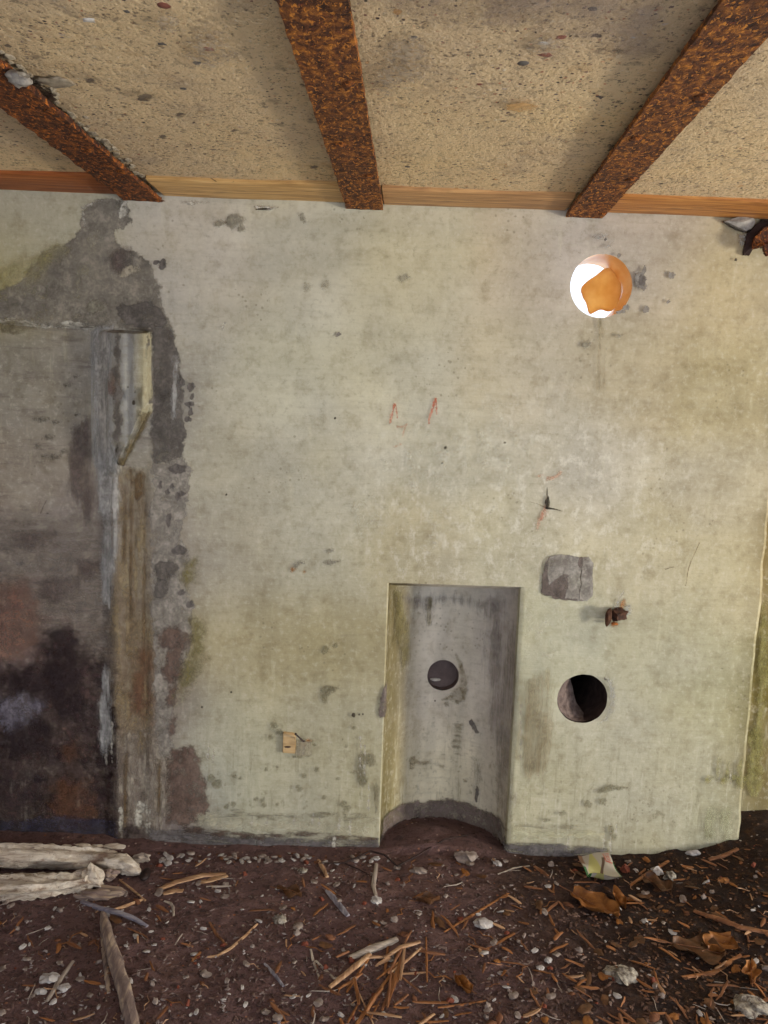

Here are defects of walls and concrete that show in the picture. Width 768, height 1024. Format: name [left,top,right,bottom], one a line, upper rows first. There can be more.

crack [536,491,561,511]
damp [0,317,617,857]
peeling [541,554,594,601]
corrosion [605,595,630,627]
damp [585,785,625,806]